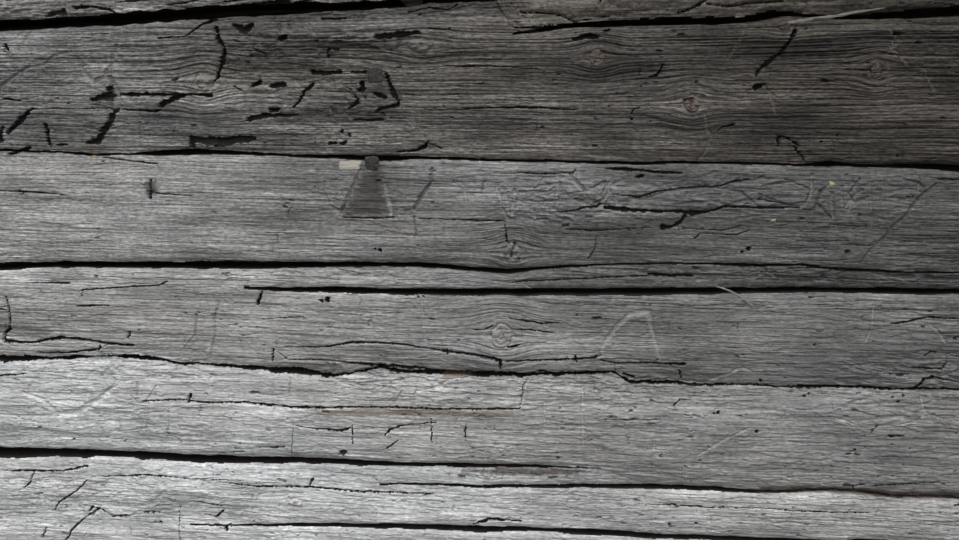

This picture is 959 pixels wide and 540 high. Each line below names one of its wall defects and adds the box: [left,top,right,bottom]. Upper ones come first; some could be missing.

crack [3,0,359,113]
crack [408,3,458,30]
crack [755,28,798,76]
crack [561,167,800,239]